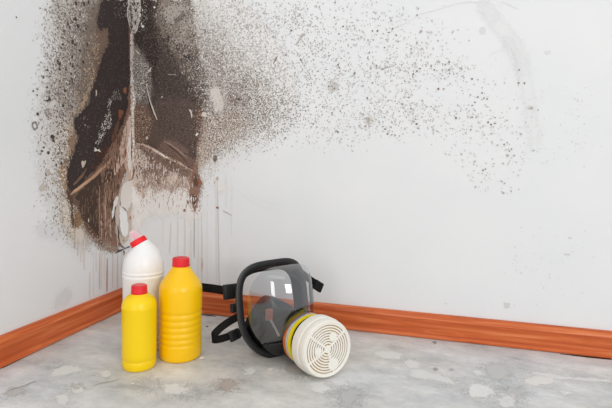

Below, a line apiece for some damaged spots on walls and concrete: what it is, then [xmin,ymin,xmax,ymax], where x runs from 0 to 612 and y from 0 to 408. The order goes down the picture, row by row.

spalling [112,33,163,245]
damp [21,0,551,298]